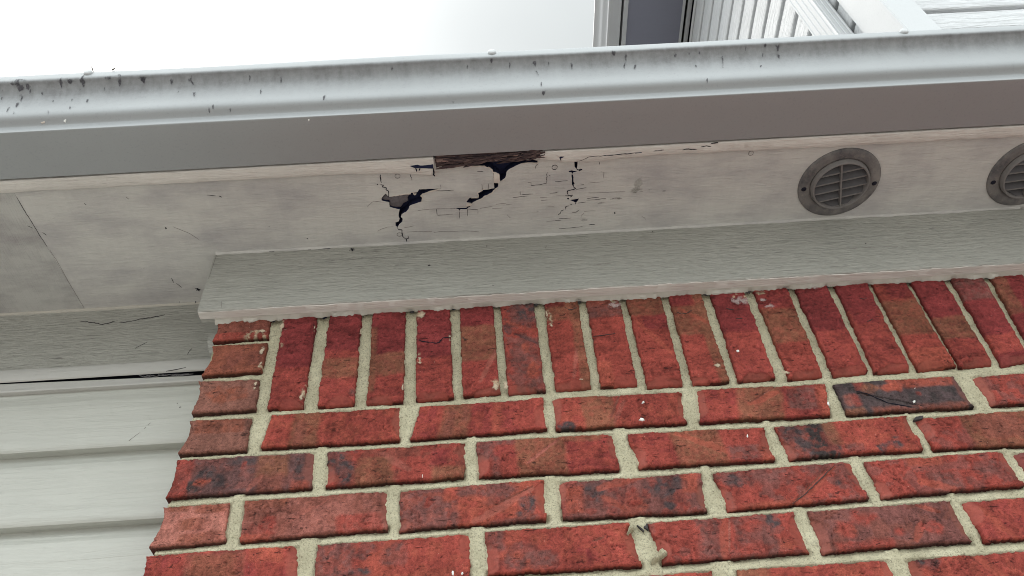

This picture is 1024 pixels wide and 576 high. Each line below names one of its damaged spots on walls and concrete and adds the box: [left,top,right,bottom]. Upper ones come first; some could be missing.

spalling [369,159,538,242]
crack [405,142,718,233]